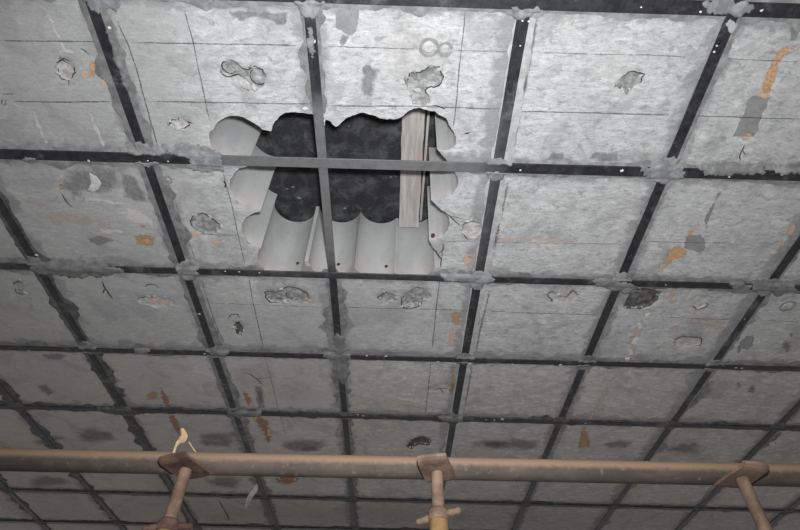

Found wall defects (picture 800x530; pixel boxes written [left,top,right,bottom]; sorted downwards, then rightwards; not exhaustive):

spalling [54,57,76,80]
spalling [220,59,266,92]
spalling [404,65,444,105]
spalling [614,71,645,95]
rust [756,47,797,99]
rust [134,225,155,245]
rust [659,246,686,272]
spalling [264,286,312,304]
spalling [377,287,432,309]
spalling [624,288,662,309]
rust [147,387,180,435]
spalling [406,436,431,449]